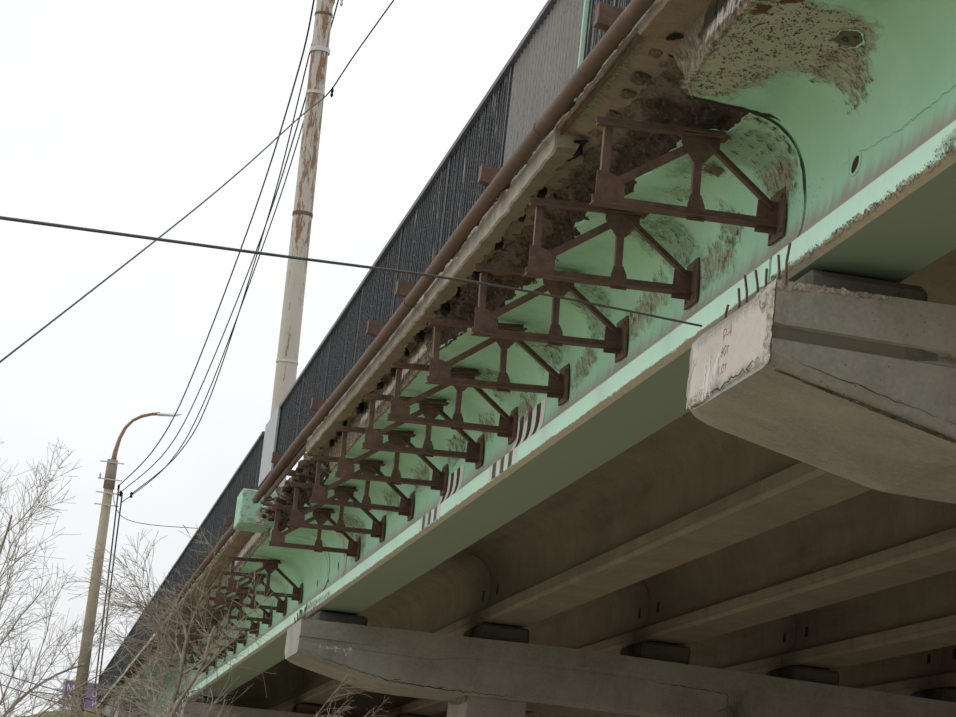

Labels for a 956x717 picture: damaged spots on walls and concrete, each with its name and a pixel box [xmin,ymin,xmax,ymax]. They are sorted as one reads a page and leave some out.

peeling [168,0,876,643]
spalling [724,129,956,444]
crack [794,358,956,425]
crack [317,655,510,697]